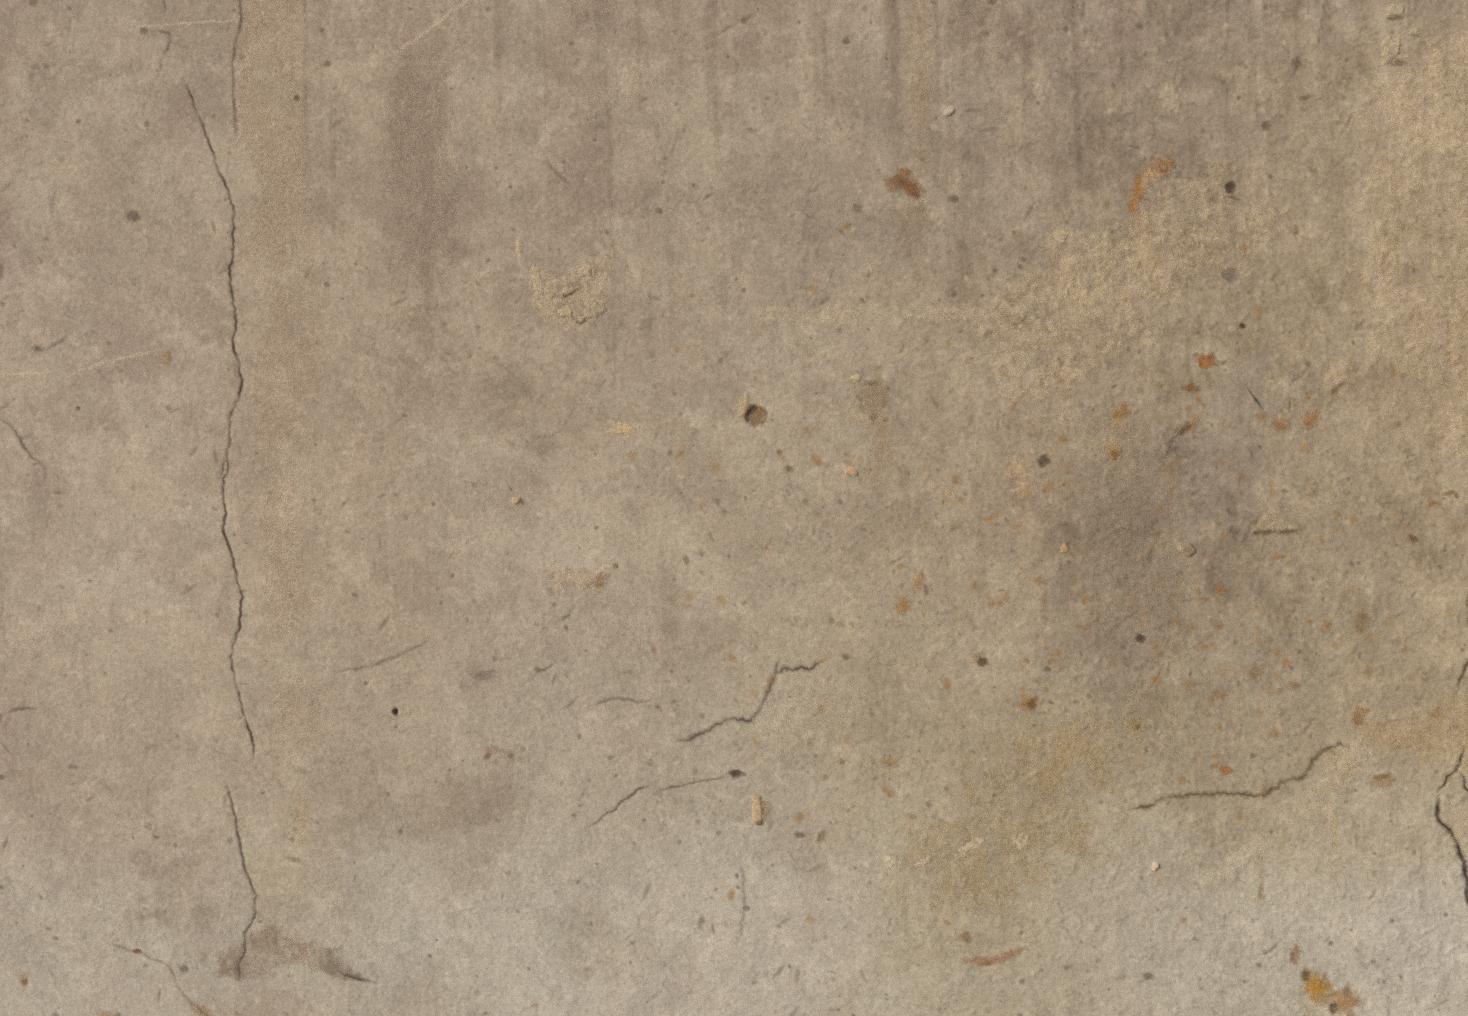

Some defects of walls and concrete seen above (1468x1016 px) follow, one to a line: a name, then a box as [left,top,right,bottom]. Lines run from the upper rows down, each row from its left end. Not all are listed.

crack [189,92,243,415]
corrosion [886,169,920,197]
crack [222,460,254,751]
crack [229,797,255,960]
crack [1436,754,1468,903]
corrosion [1291,946,1357,1015]